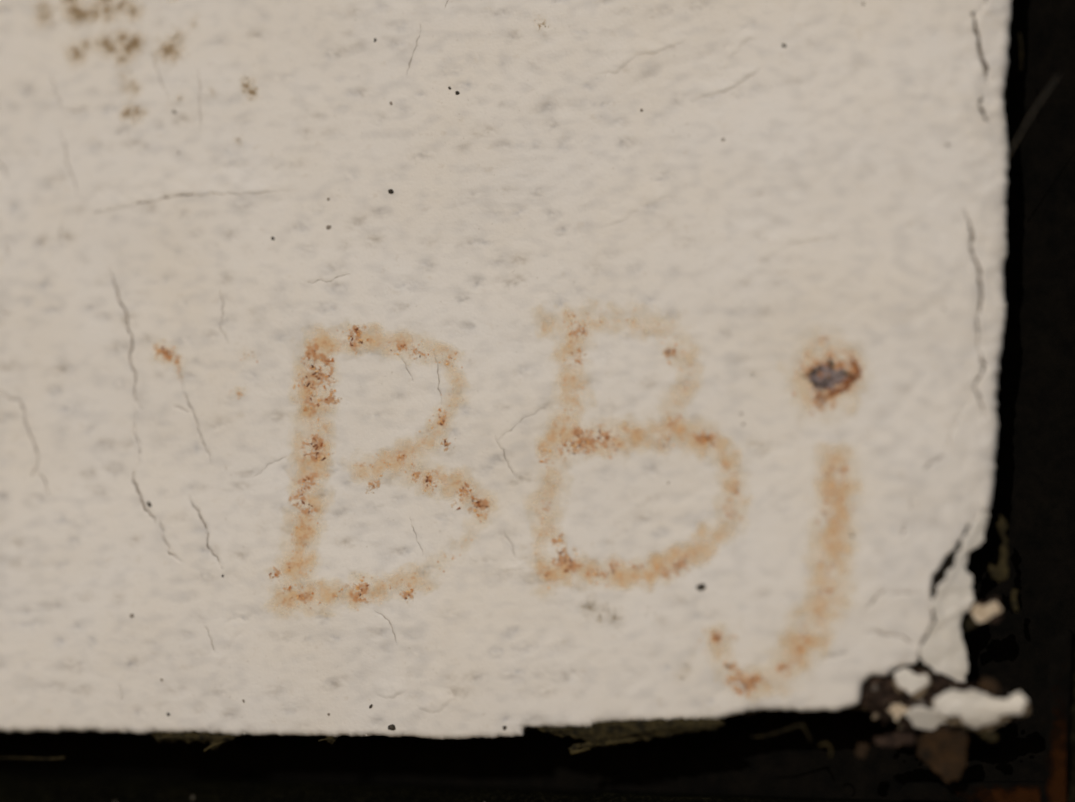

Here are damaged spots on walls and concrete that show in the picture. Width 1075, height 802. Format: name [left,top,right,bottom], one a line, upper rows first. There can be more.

water stain [62,0,137,22]
water stain [71,34,140,93]
crack [972,0,989,122]
crack [109,269,181,561]
rust [269,325,463,610]
rust [356,394,490,523]
rust [535,308,743,589]
rust [696,455,855,697]
rust [792,336,864,415]
peeling [856,509,1030,784]
crack [923,210,986,471]